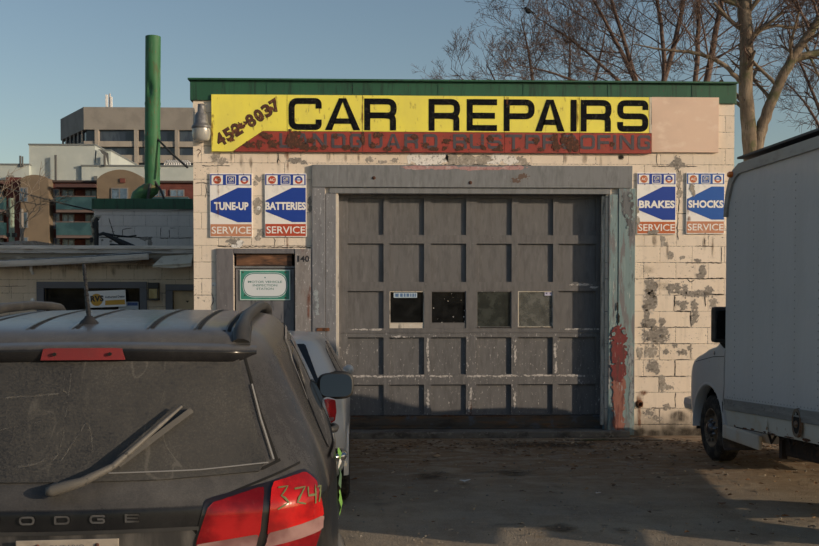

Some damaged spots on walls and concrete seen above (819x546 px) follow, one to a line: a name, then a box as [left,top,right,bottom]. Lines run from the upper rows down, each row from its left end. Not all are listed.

corrosion [228,121,338,166]
corrosion [342,106,470,152]
spalling [365,153,530,183]
peeling [620,188,640,237]
peeling [609,230,715,430]